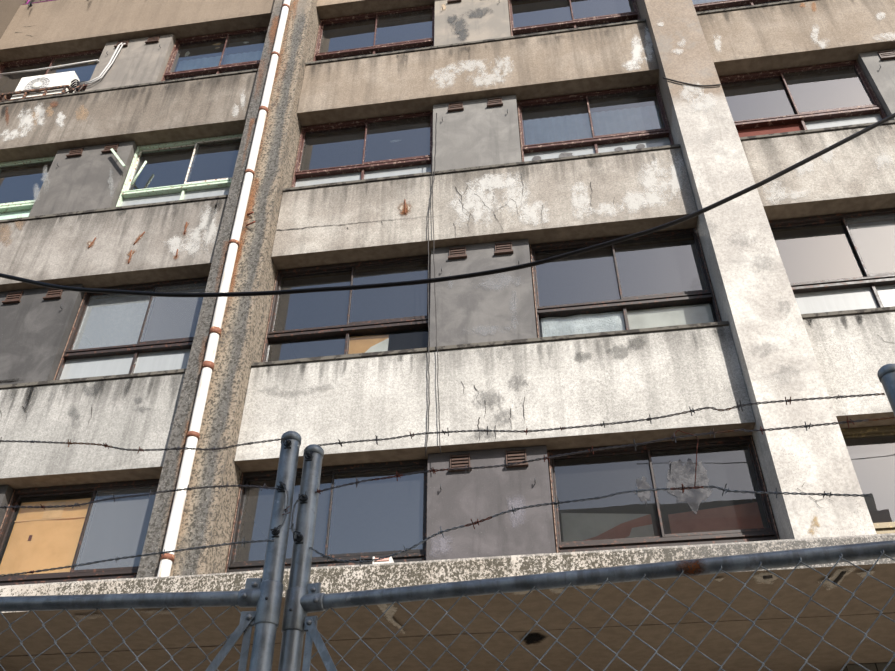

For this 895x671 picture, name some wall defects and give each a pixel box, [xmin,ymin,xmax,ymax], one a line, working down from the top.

damp [448,8,493,41]
damp [624,23,663,69]
damp [682,84,715,110]
damp [1,107,44,141]
crack [277,174,543,233]
damp [573,157,684,217]
spalling [821,567,875,589]
peeling [377,604,405,634]